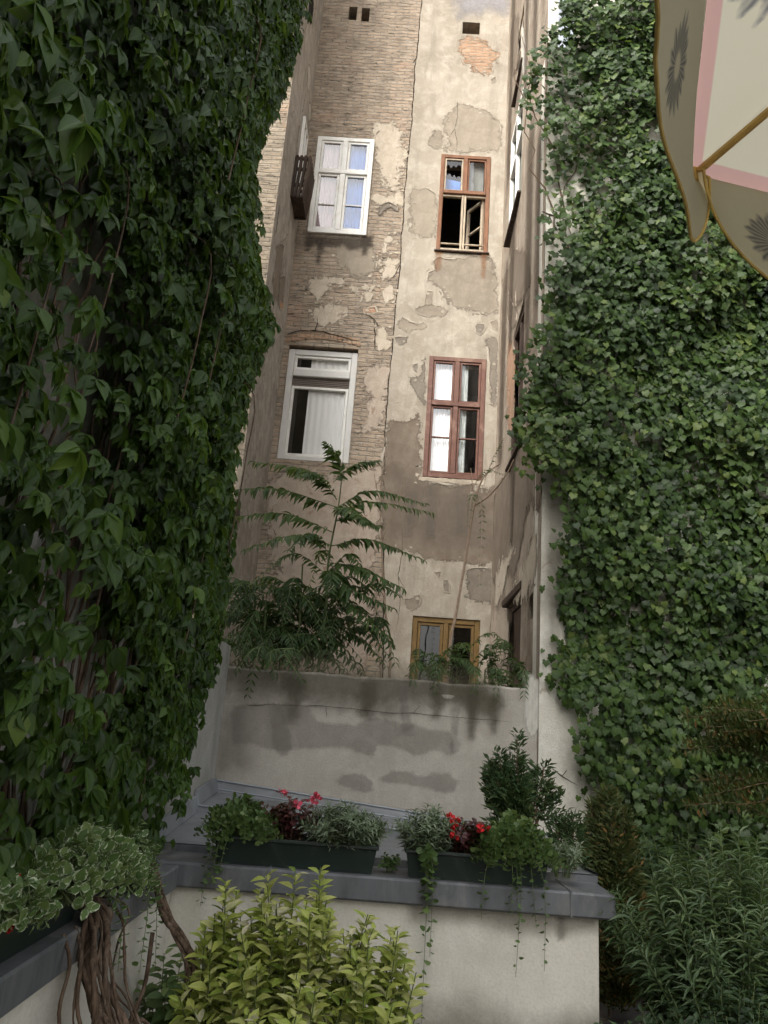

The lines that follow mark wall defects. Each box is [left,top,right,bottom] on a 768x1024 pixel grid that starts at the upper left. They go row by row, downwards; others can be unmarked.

peeling [457,12,519,84]
spalling [428,103,504,153]
spalling [375,187,404,215]
spalling [385,247,531,431]
peeling [379,358,542,668]